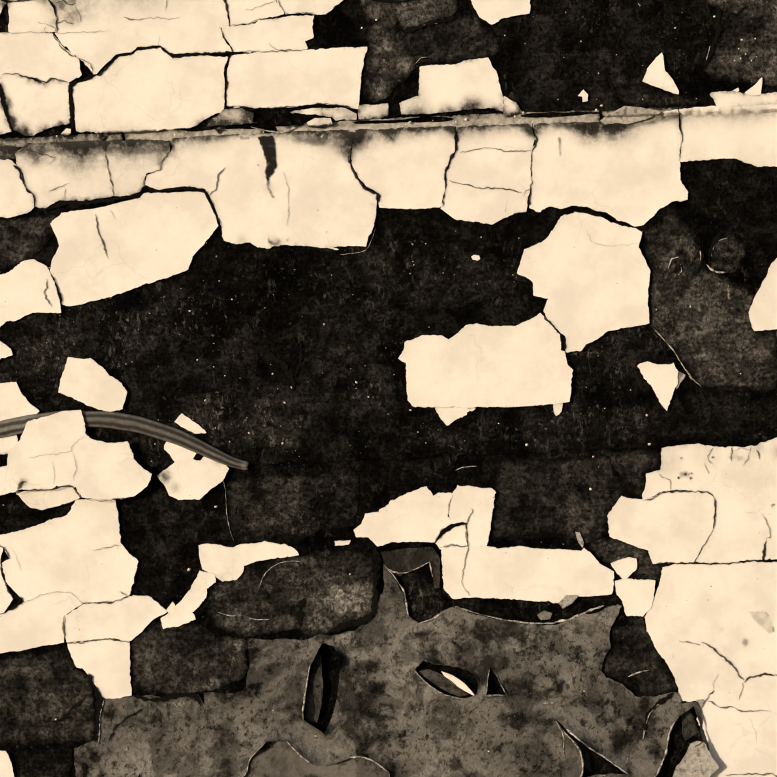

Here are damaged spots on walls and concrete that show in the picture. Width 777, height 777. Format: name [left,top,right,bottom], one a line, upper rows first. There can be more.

crack [0,0,355,133]
crack [13,150,224,257]
crack [348,147,381,204]
peeling [0,0,777,425]
crack [442,123,538,206]
crack [646,475,777,565]
crack [0,546,23,613]
peeling [0,357,777,777]
crack [62,618,130,644]
crack [643,691,676,738]
crack [680,641,777,712]
crack [726,769,777,777]